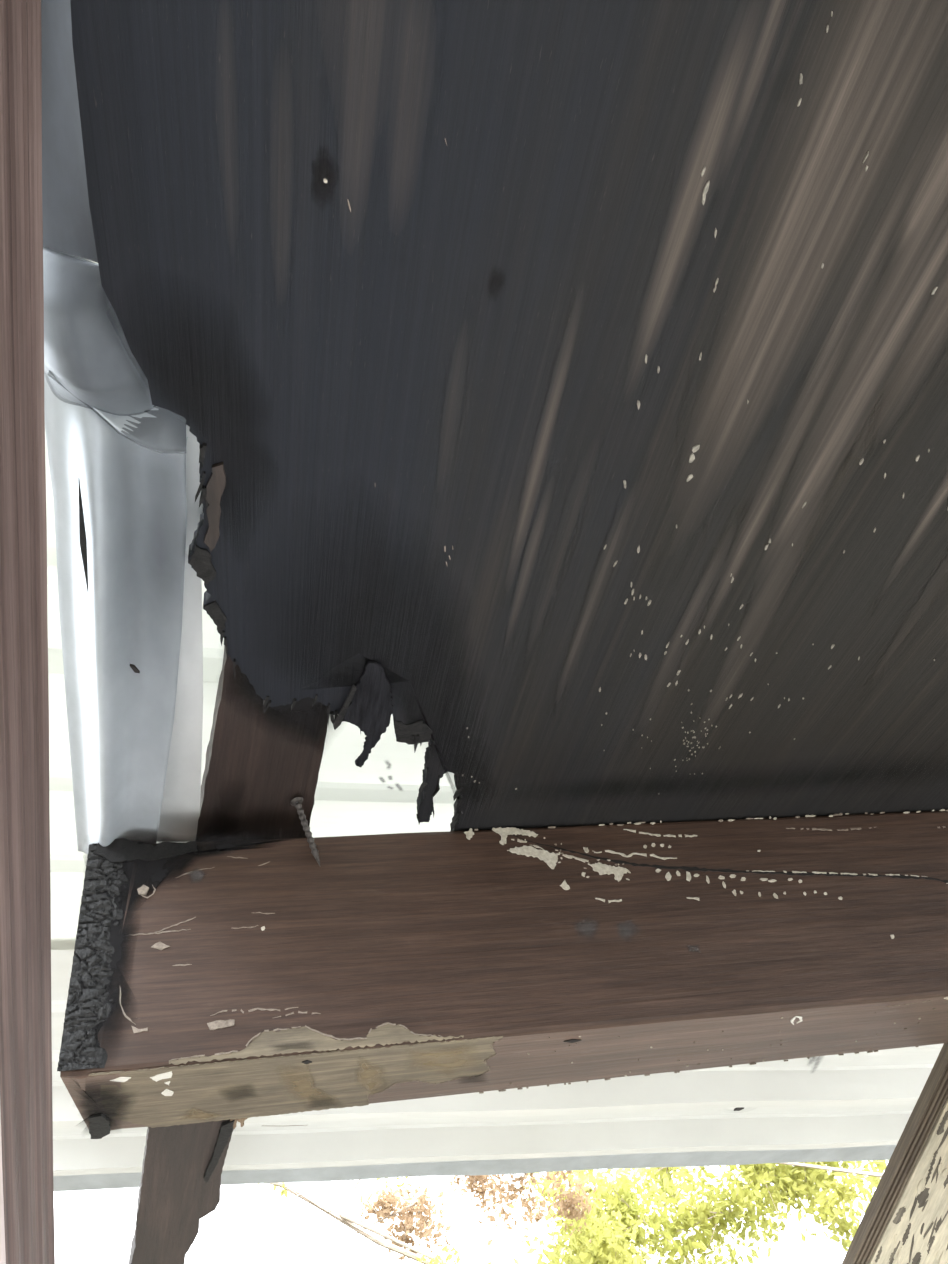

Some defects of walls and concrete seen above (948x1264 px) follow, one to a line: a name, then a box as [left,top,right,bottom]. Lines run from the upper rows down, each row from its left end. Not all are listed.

peeling [188,545,216,586]
peeling [203,601,227,635]
peeling [394,719,432,745]
peeling [719,812,885,831]
peeling [464,820,842,900]
peeling [88,1007,503,1128]
peeling [875,1111,948,1264]